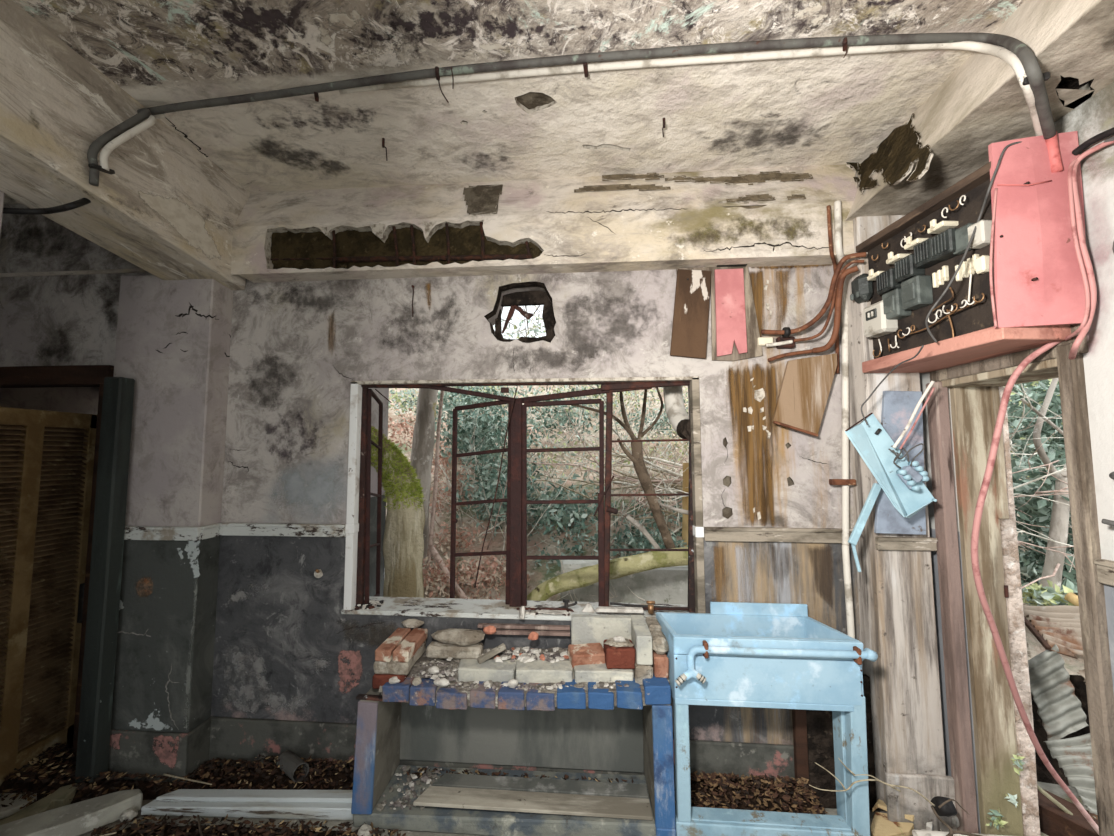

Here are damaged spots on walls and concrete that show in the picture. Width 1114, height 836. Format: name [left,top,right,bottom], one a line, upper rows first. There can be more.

spalling [514,92,557,114]
crack [165,117,223,170]
spalling [846,113,934,195]
spalling [574,171,813,209]
spalling [264,185,544,270]
crack [704,242,829,252]
crack [156,303,231,357]
damp [254,288,339,346]
hole [484,281,556,343]
damp [507,297,653,370]
mould [249,357,293,407]
damp [266,412,317,459]